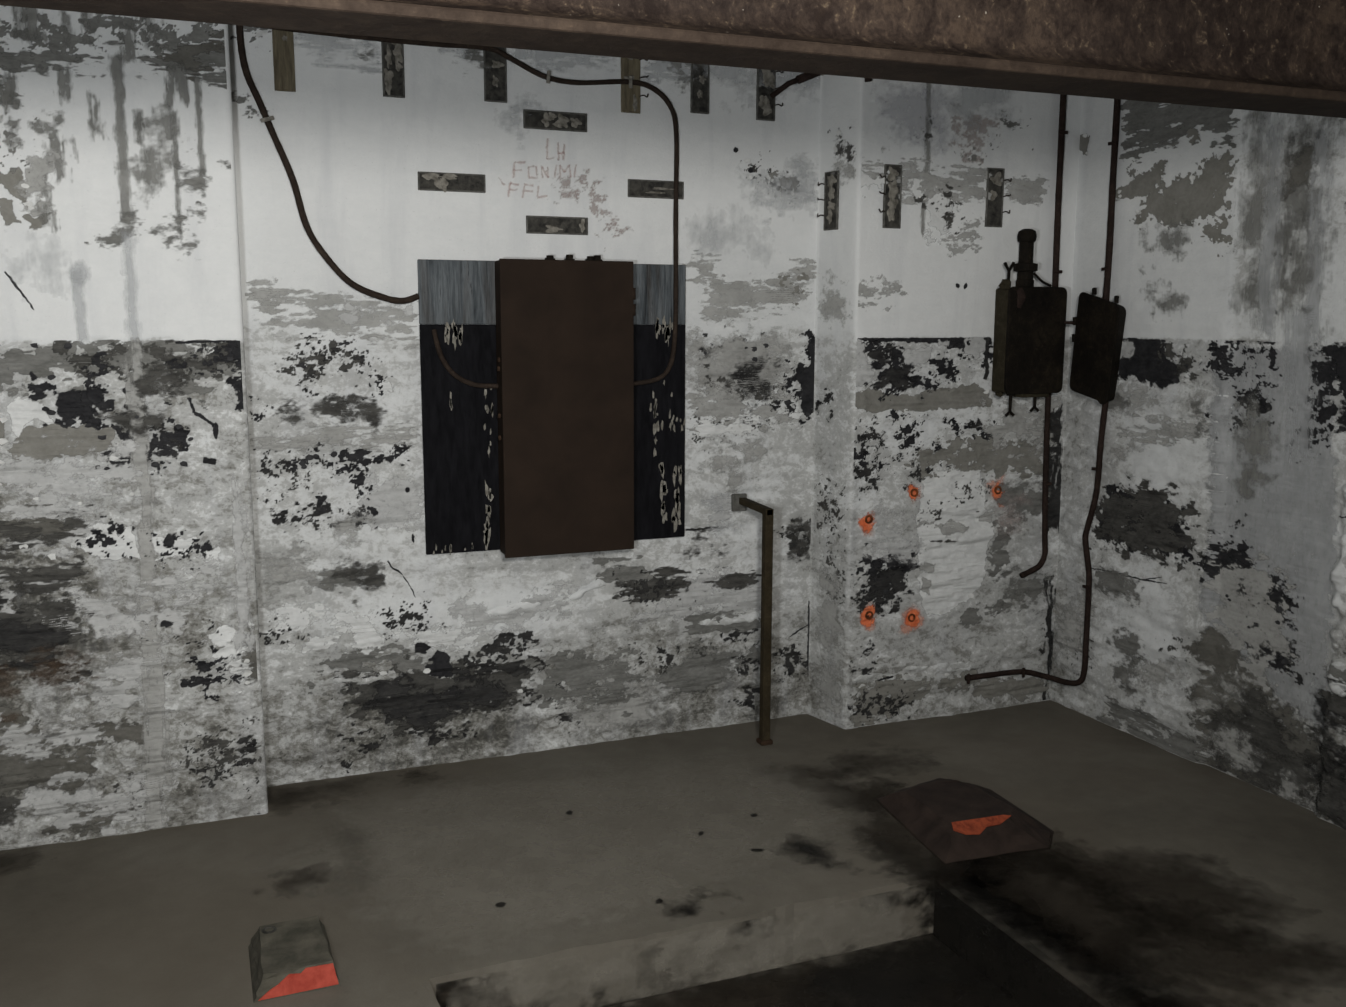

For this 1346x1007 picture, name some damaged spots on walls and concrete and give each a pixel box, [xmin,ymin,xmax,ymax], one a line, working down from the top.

water stain [0,6,271,247]
peeling [827,127,1047,257]
peeling [1115,100,1240,257]
water stain [1241,111,1333,308]
water stain [0,338,313,842]
flaking render [0,279,418,543]
peeling [444,319,463,349]
peeling [433,482,494,555]
peeling [649,250,907,532]
flaking render [847,640,1049,727]
flaking render [850,337,1062,628]
peeling [1117,338,1346,695]